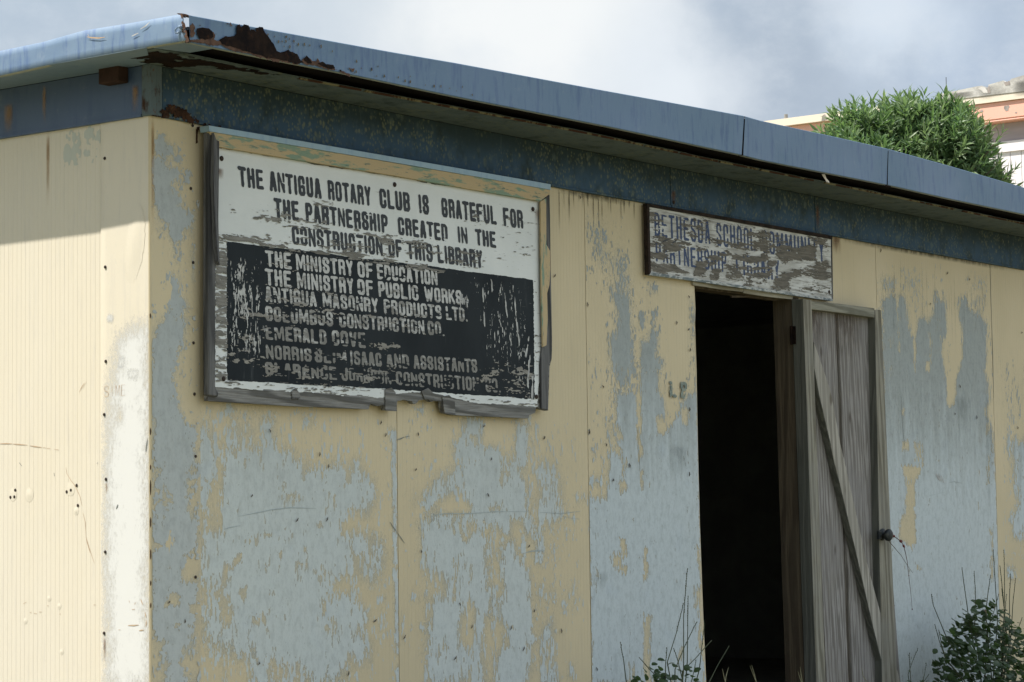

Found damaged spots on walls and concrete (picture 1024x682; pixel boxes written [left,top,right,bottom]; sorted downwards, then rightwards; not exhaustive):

rust [152,104,221,143]
rust [130,13,385,77]
peeling [101,130,706,682]
peeling [876,264,1024,682]